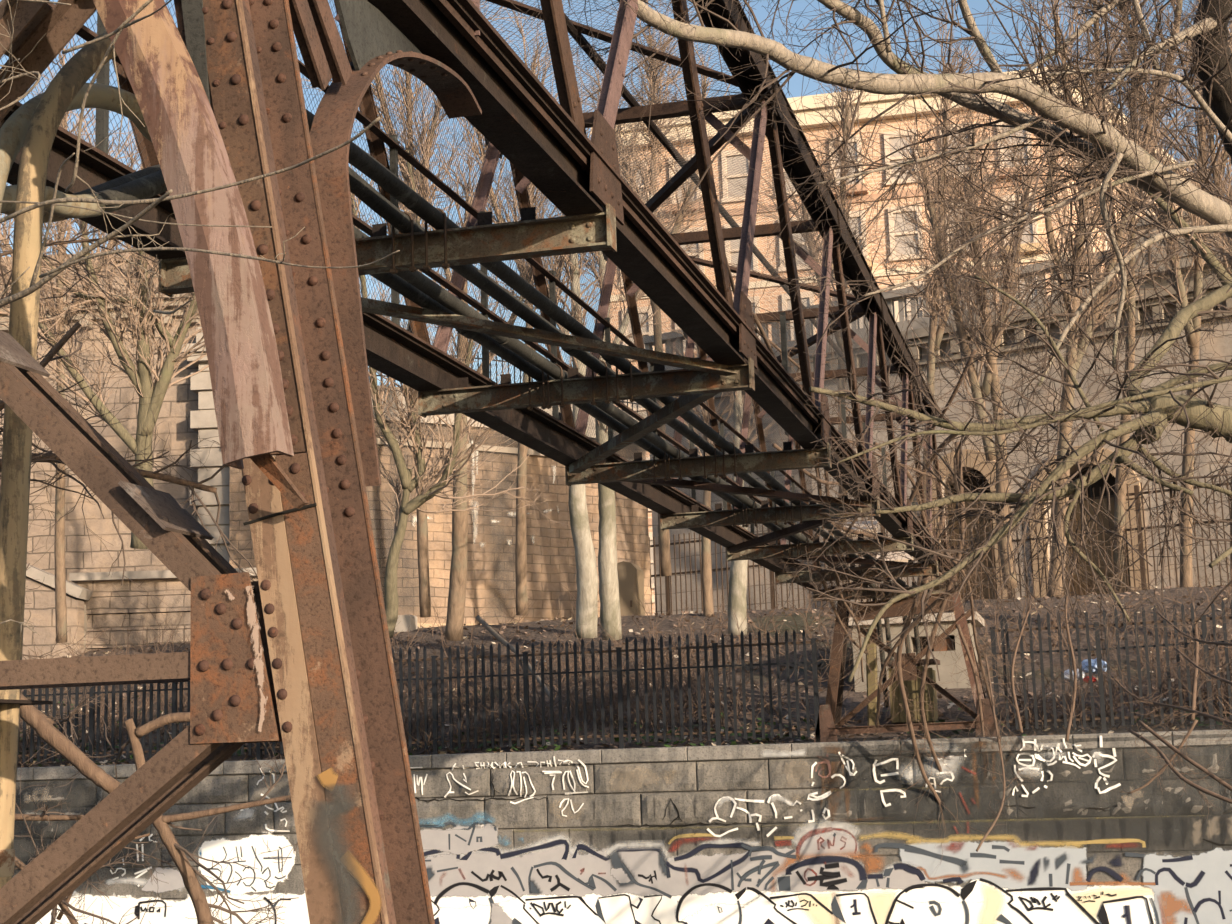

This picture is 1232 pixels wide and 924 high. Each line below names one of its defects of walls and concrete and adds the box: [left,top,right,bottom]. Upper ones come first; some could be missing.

peeling [224,586,268,732]